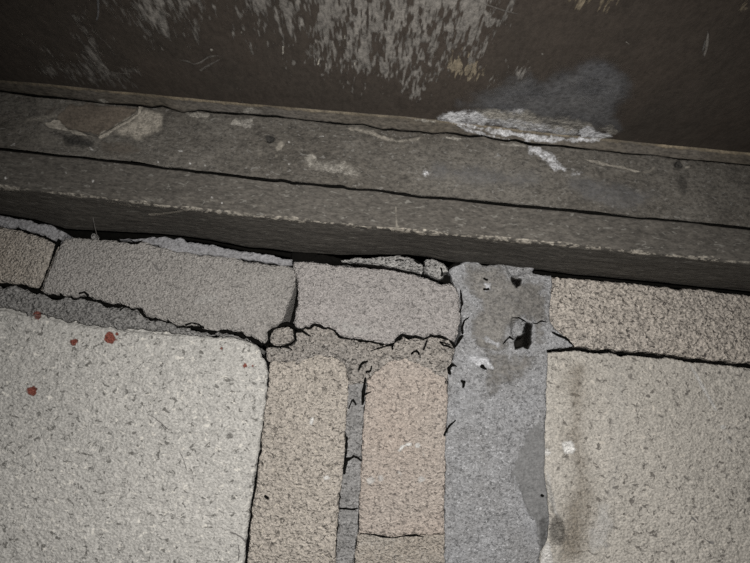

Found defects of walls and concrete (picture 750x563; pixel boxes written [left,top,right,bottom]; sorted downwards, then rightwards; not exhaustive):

efflorescence [421,63,627,171]
crack [0,149,750,230]
crack [0,214,469,409]
hole [514,322,532,349]
crack [512,317,750,368]
crack [230,421,264,563]
crack [343,436,362,474]